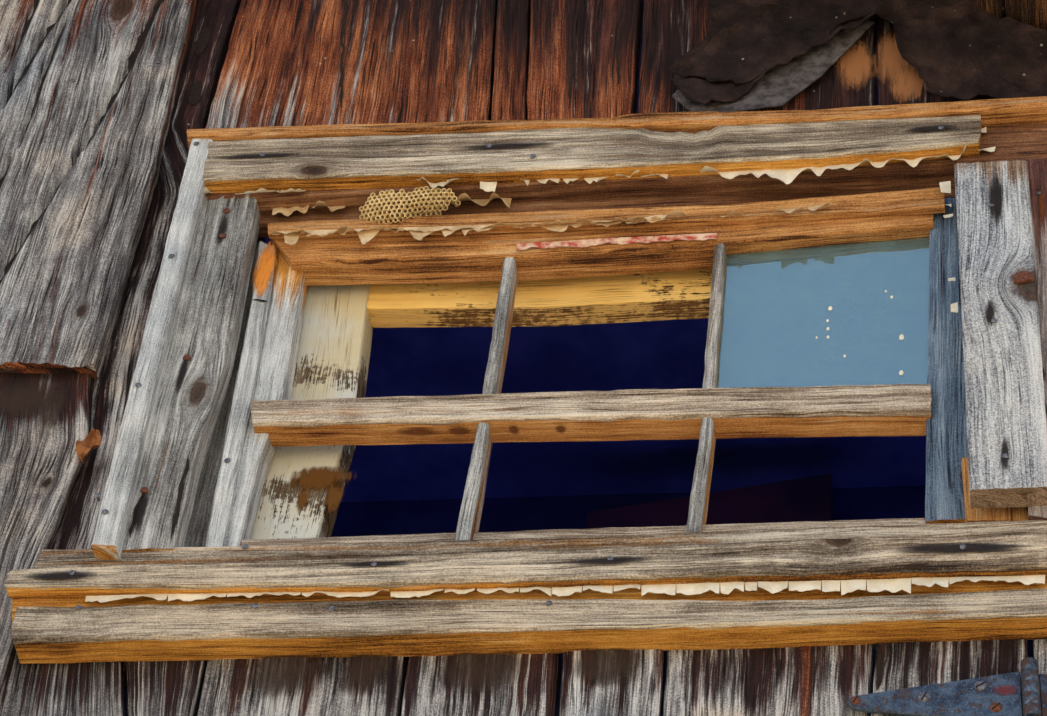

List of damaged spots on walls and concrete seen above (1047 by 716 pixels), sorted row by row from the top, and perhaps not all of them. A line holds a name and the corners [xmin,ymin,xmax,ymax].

peeling [272,201,345,216]
peeling [417,177,457,188]
peeling [453,181,512,208]
peeling [521,170,668,186]
peeling [775,203,831,213]
peeling [700,145,966,184]
peeling [939,181,953,218]
peeling [270,211,717,251]
peeling [85,575,1045,603]